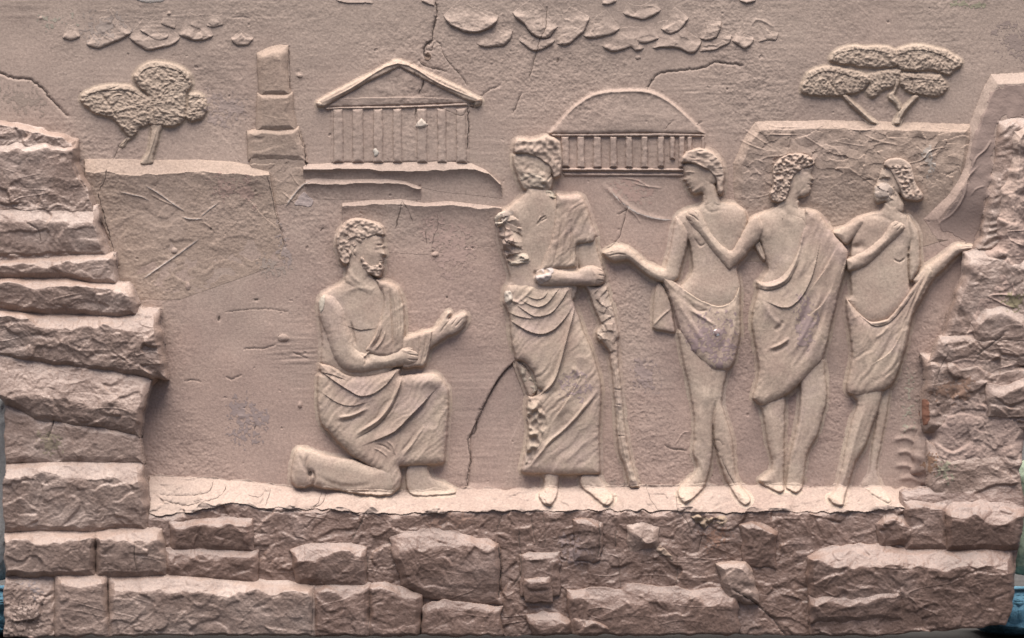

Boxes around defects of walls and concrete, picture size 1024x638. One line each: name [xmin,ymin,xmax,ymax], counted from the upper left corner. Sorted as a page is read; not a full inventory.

crack [415,2,496,147]
crack [466,366,511,486]